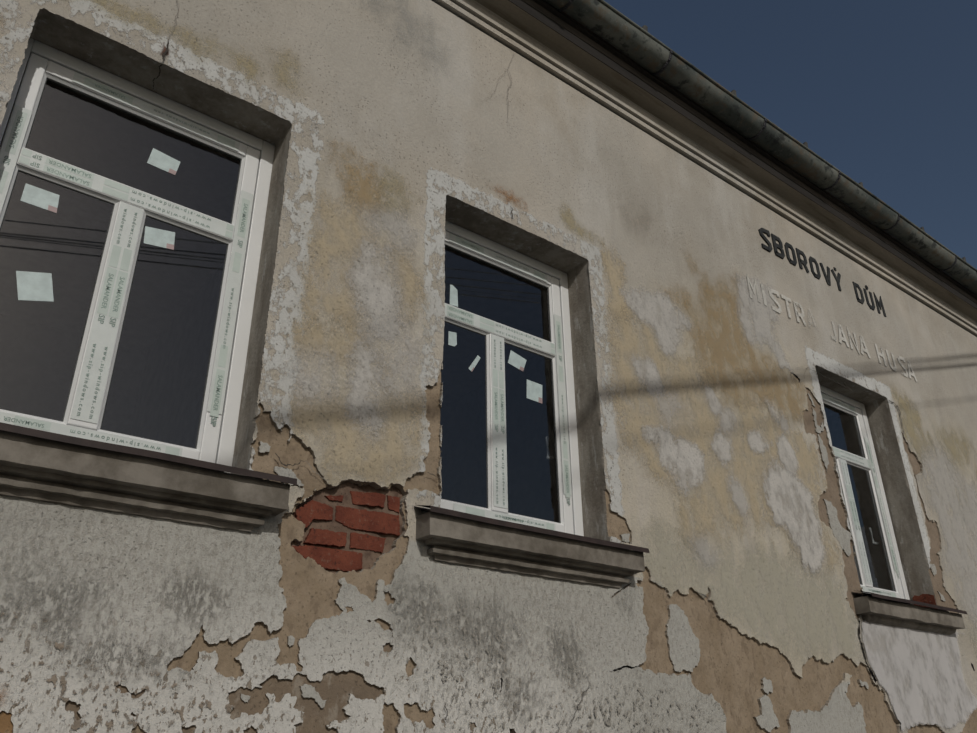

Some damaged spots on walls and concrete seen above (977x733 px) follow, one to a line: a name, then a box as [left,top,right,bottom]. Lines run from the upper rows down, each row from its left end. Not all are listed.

peeling [0,0,34,111]
crack [153,0,179,89]
damp [294,164,426,365]
flaking render [47,0,632,733]
peeling [619,288,691,354]
damp [291,362,427,485]
peeling [642,387,736,495]
peeling [747,345,959,621]
flaking render [0,656,36,733]
flaking render [425,566,900,733]
flaking render [908,724,945,733]
flaking render [960,708,977,733]